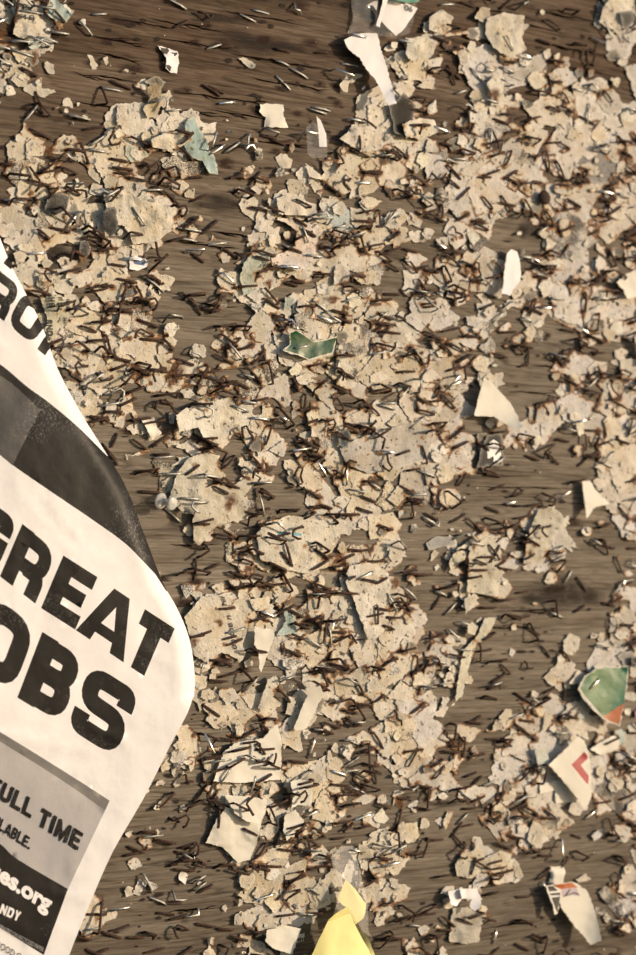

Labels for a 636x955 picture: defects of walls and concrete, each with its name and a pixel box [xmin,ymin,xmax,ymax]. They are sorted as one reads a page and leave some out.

corrosion [168,365,183,388]